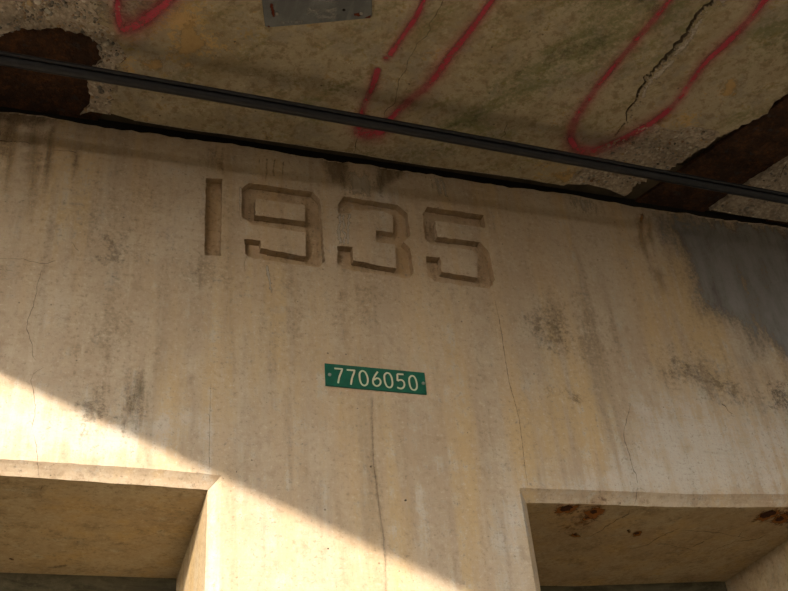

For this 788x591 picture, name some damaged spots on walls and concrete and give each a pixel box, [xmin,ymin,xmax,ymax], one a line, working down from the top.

spalling [0,0,127,70]
crack [615,0,729,135]
spalling [80,80,113,115]
spalling [595,124,720,170]
spalling [570,168,647,196]
spalling [742,156,788,193]
spalling [709,194,788,222]
rust [554,499,605,537]
rust [752,508,788,525]